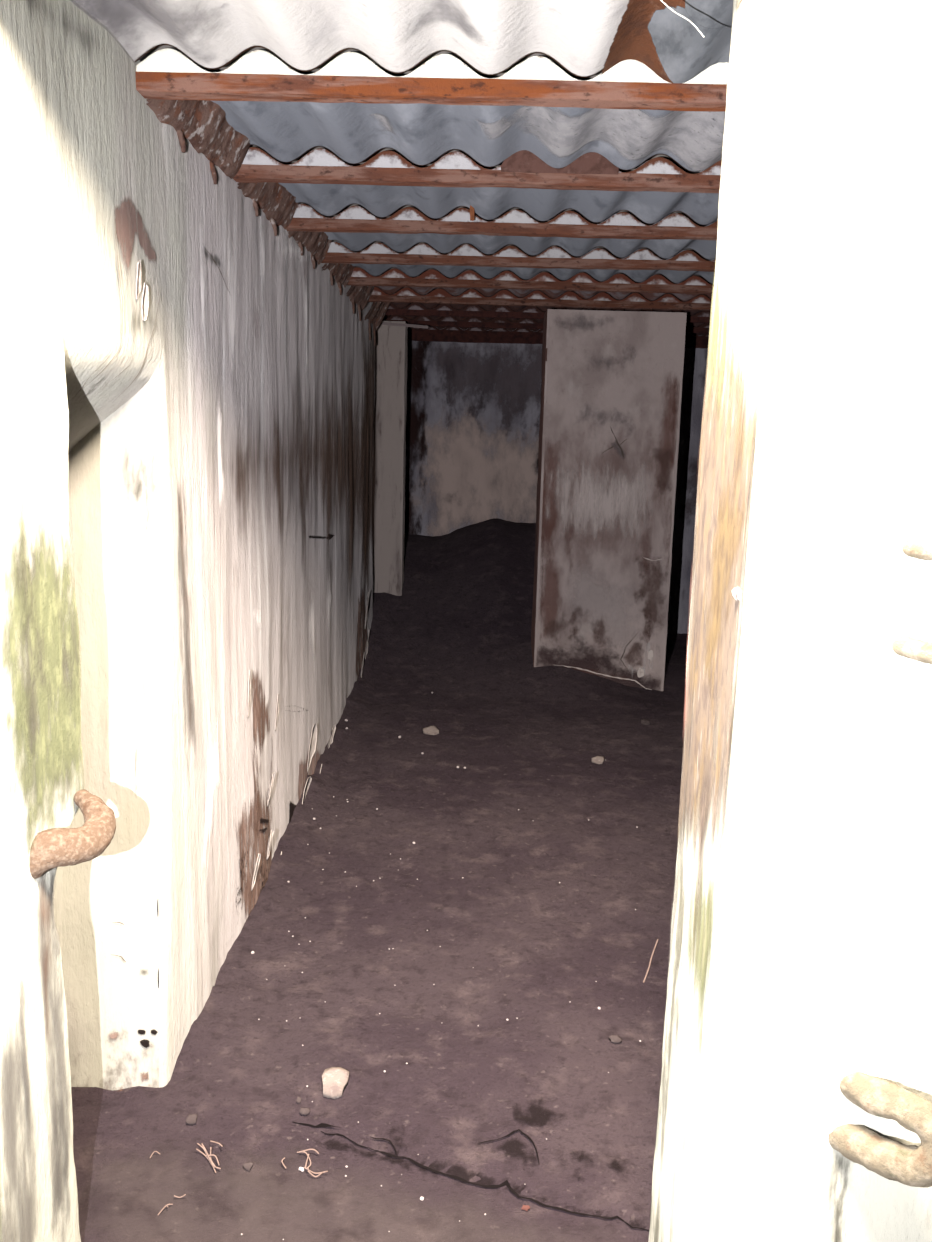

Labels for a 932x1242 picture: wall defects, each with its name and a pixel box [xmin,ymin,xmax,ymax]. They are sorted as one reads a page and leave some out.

peeling [601,0,733,83]
leakage [404,341,542,535]
leakage [557,471,645,531]
leakage [20,516,33,624]
leakage [539,575,659,690]
leakage [635,557,662,635]
leakage [678,265,759,1051]
leakage [18,689,37,851]